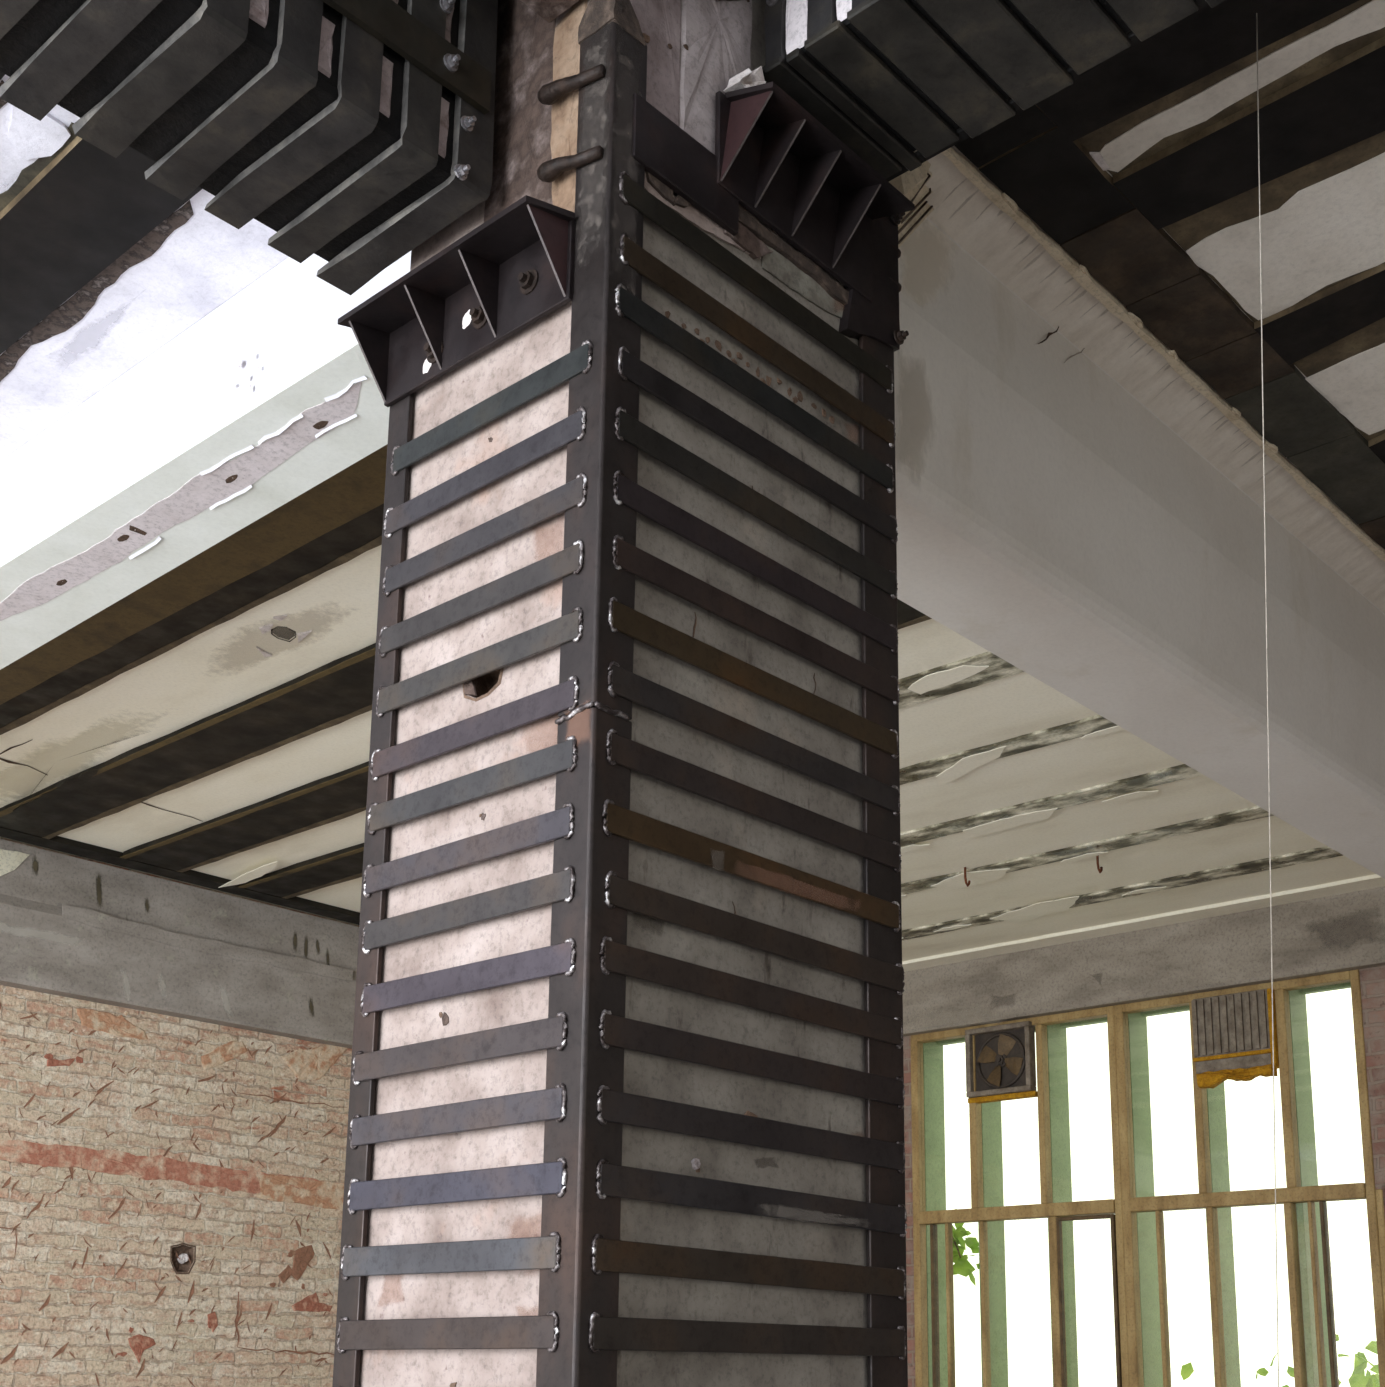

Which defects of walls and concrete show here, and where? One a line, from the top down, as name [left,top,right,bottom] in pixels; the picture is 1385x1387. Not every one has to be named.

peeling [0,200,194,382]
peeling [0,376,367,621]
peeling [908,665,989,694]
peeling [936,746,1006,783]
peeling [963,808,1057,839]
peeling [0,849,29,876]
peeling [219,861,277,888]
peeling [902,874,1385,972]
crack [237,1092,332,1107]
spalling [170,1243,196,1274]
spalling [269,1245,333,1312]
crack [235,1306,334,1355]